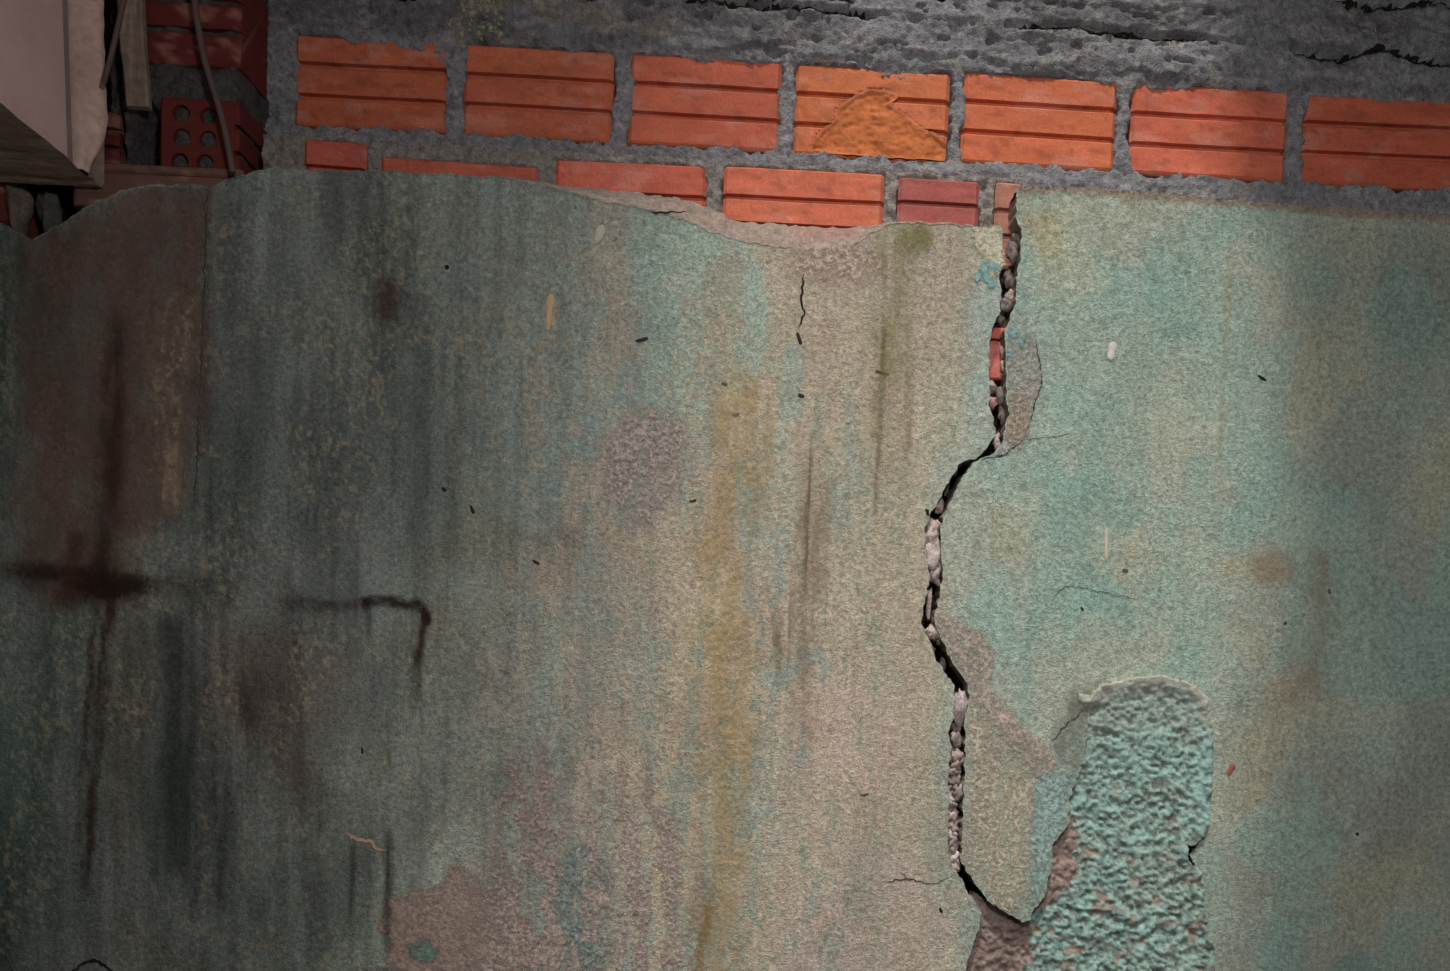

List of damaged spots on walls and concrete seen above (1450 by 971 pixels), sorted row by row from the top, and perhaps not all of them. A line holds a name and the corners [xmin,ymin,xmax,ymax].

crack [685,0,875,21]
crack [1020,24,1217,43]
crack [1293,0,1450,67]
spalling [811,88,946,161]
crack [798,274,806,328]
peeling [991,325,1042,457]
crack [883,233,1071,895]
flaking render [937,614,1215,971]
peeling [371,736,706,971]
crack [71,959,113,971]